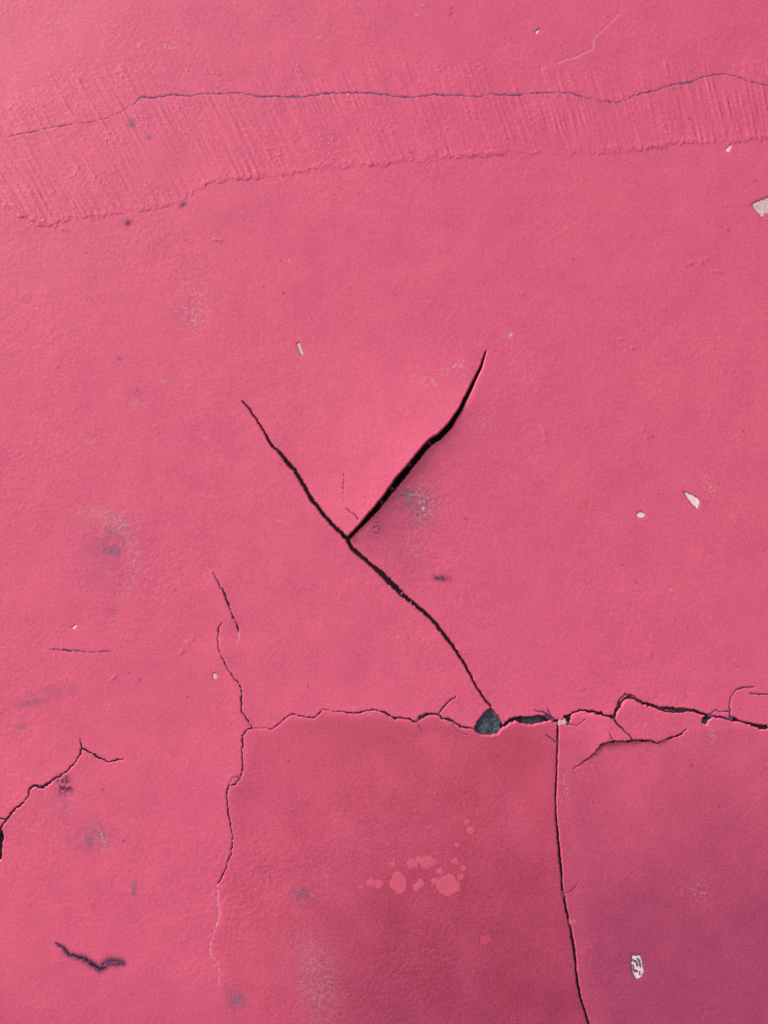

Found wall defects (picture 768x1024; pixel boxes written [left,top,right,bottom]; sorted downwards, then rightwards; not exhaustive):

crack [9,14,768,137]
peeling [751,197,768,219]
peeling [683,491,701,509]
crack [206,357,768,1024]
crack [0,739,124,859]
crack [55,942,125,971]
peeling [630,954,645,980]